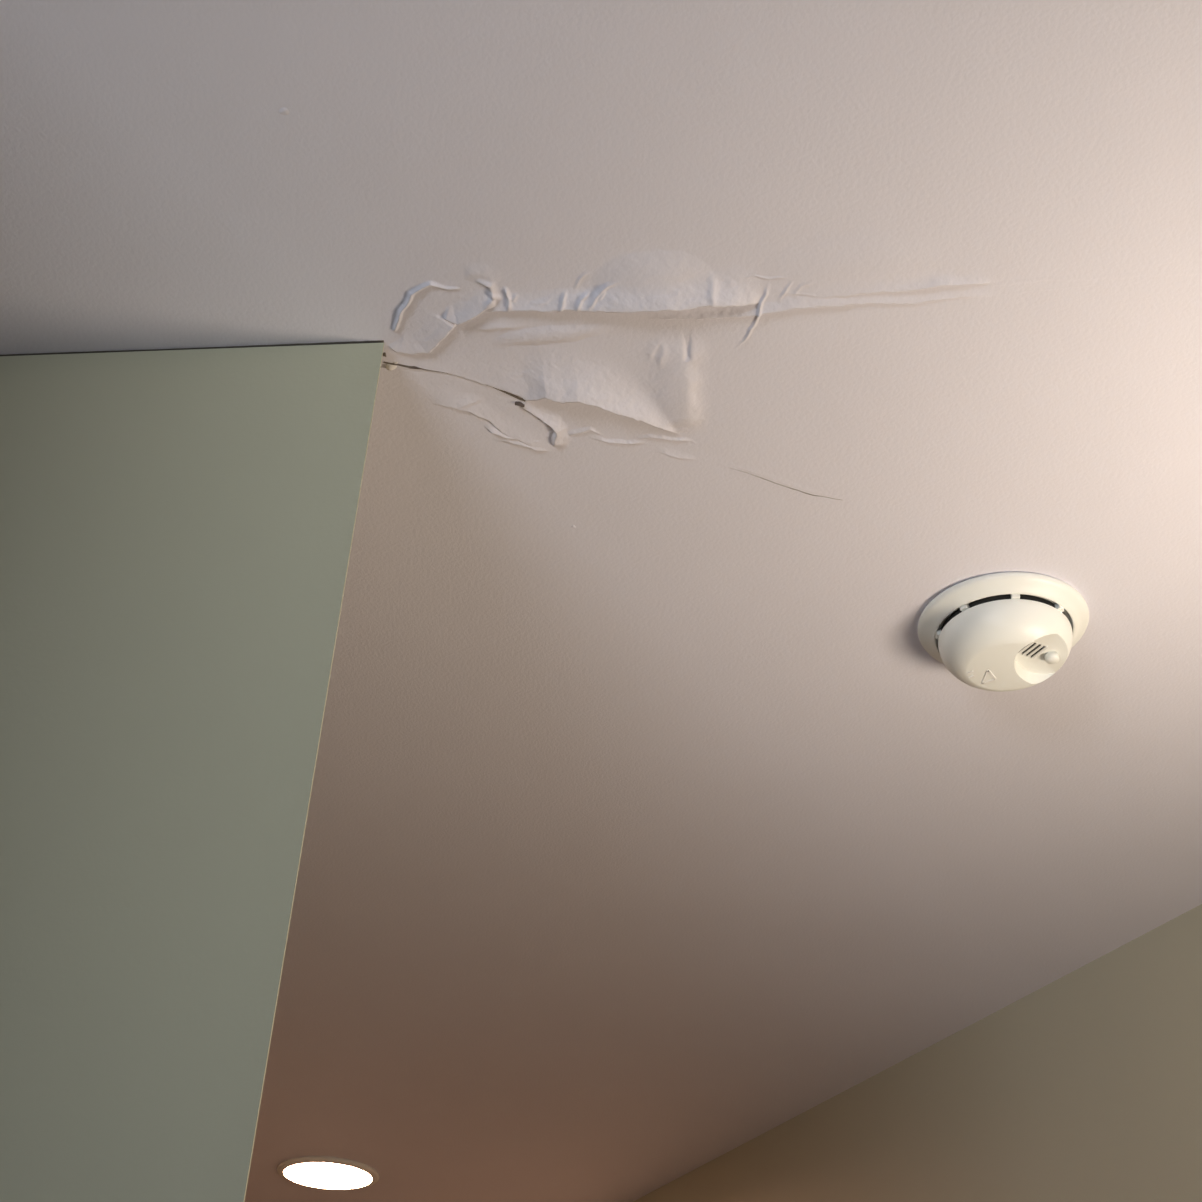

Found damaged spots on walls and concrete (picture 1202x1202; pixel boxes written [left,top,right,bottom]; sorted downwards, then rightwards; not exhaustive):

peeling [383,239,997,462]
crack [698,456,841,500]